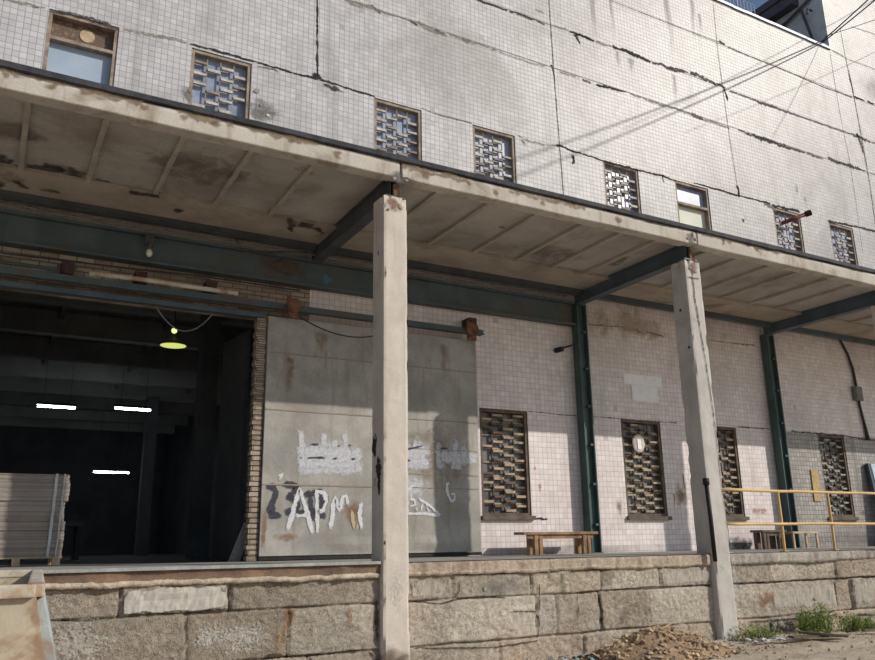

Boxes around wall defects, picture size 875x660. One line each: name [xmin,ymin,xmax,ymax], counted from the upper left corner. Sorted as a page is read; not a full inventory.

crack [10,0,375,97]
crack [345,0,870,172]
leakage [27,163,85,178]
crack [518,135,800,213]
leakage [287,218,324,234]
crack [414,565,711,649]